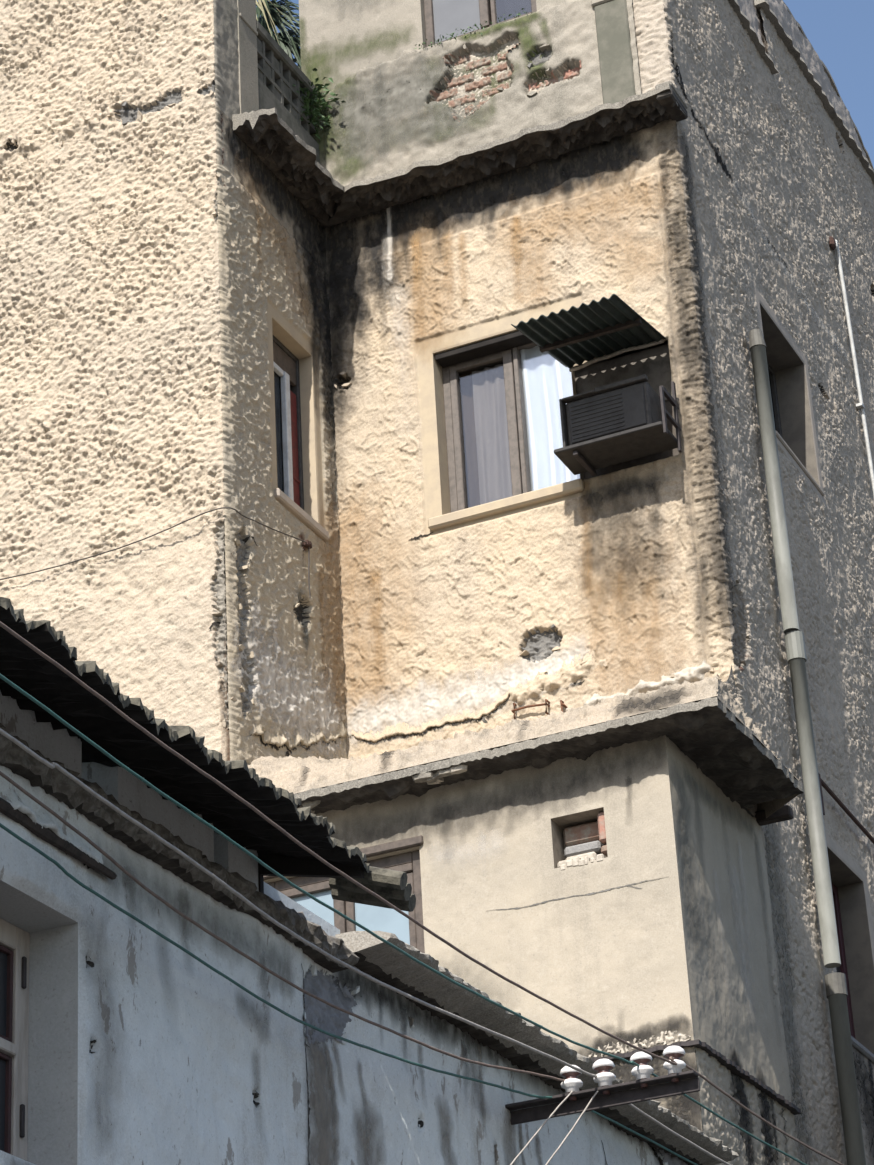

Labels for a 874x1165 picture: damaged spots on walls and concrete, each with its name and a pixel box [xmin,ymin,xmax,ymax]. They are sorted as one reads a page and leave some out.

spalling [114,90,182,126]
spalling [197,80,224,96]
damp [321,57,473,155]
flaking render [425,34,582,122]
crack [670,27,792,274]
damp [226,119,642,428]
crack [249,649,596,757]
flaking render [509,624,609,719]
crack [496,877,665,910]
spalling [303,964,362,1044]
damp [307,1033,339,1165]
damp [731,1050,783,1165]